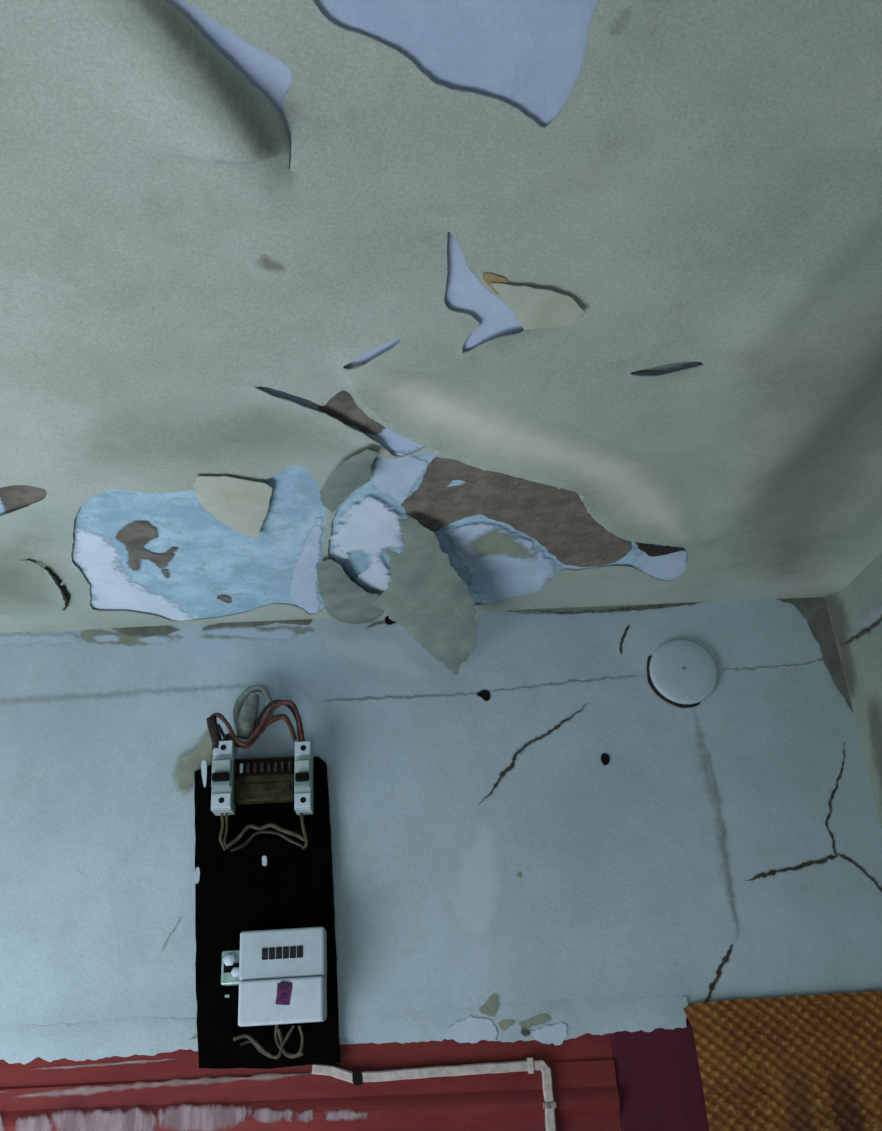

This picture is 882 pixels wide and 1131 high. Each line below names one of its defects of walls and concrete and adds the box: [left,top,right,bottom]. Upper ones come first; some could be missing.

peeling [0,625,180,646]
peeling [202,619,314,641]
crack [841,615,882,645]
crack [479,703,588,804]
crack [746,742,882,892]